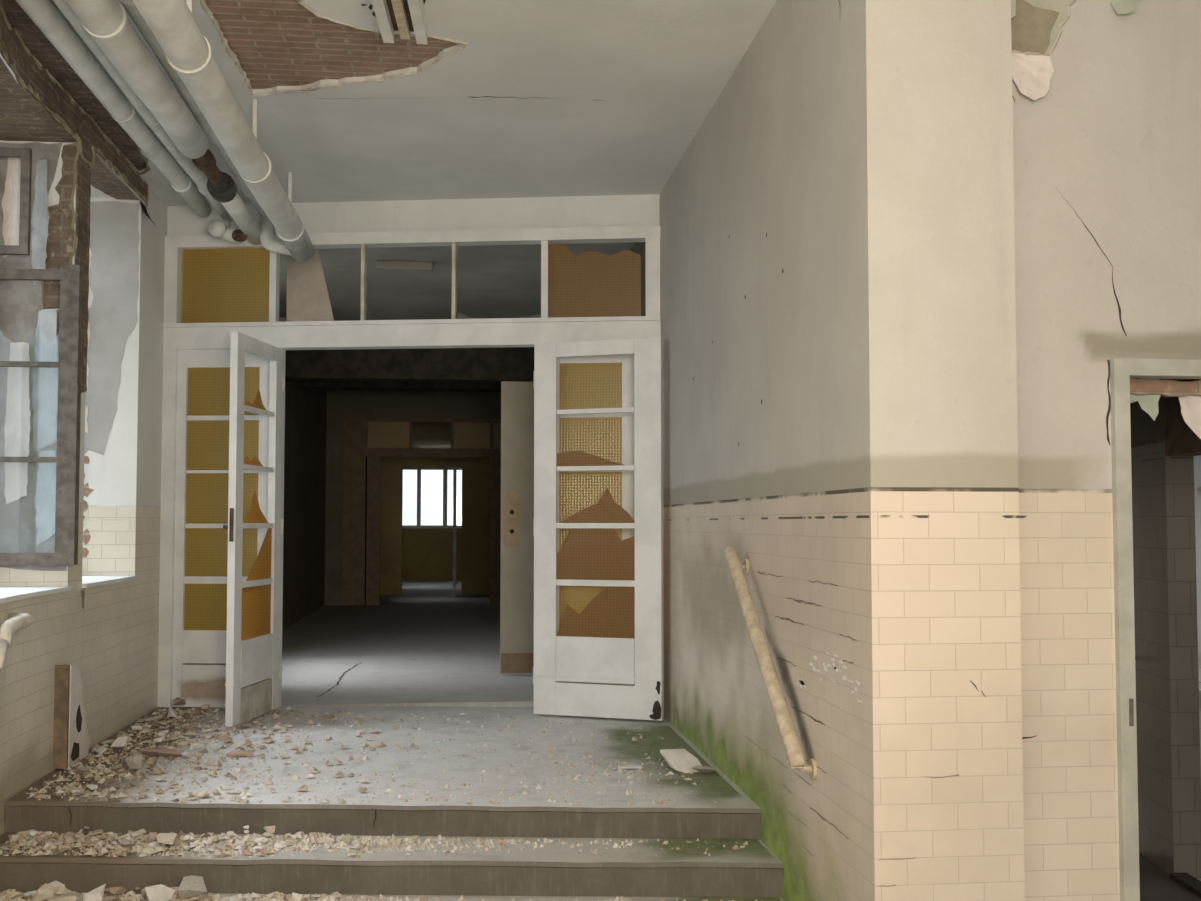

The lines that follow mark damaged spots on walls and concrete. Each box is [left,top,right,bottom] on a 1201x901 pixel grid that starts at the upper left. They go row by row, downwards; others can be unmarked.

spalling [199,0,468,96]
peeling [1011,0,1077,101]
peeling [0,0,156,571]
crack [1059,192,1127,336]
crack [1104,360,1112,445]
peeling [1130,378,1201,439]